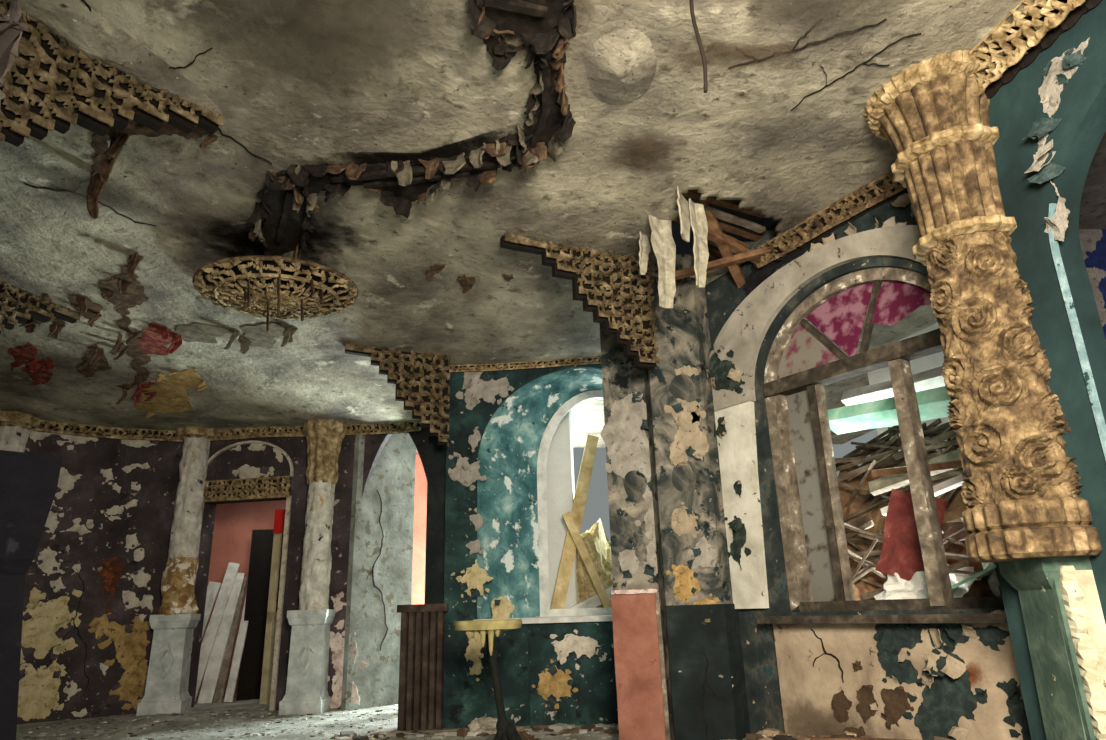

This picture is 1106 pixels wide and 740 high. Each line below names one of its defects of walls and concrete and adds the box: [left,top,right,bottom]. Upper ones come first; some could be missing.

crack [729,18,921,111]
flaking render [247,0,577,259]
peeling [1021,37,1106,339]
peeling [455,371,514,410]
peeling [674,345,745,394]
peeling [448,426,487,490]
flaking render [601,392,751,625]
flaking render [17,462,154,721]
flaking render [456,513,515,619]
peeling [532,630,607,709]
crack [810,628,844,683]
peeling [831,610,1031,740]